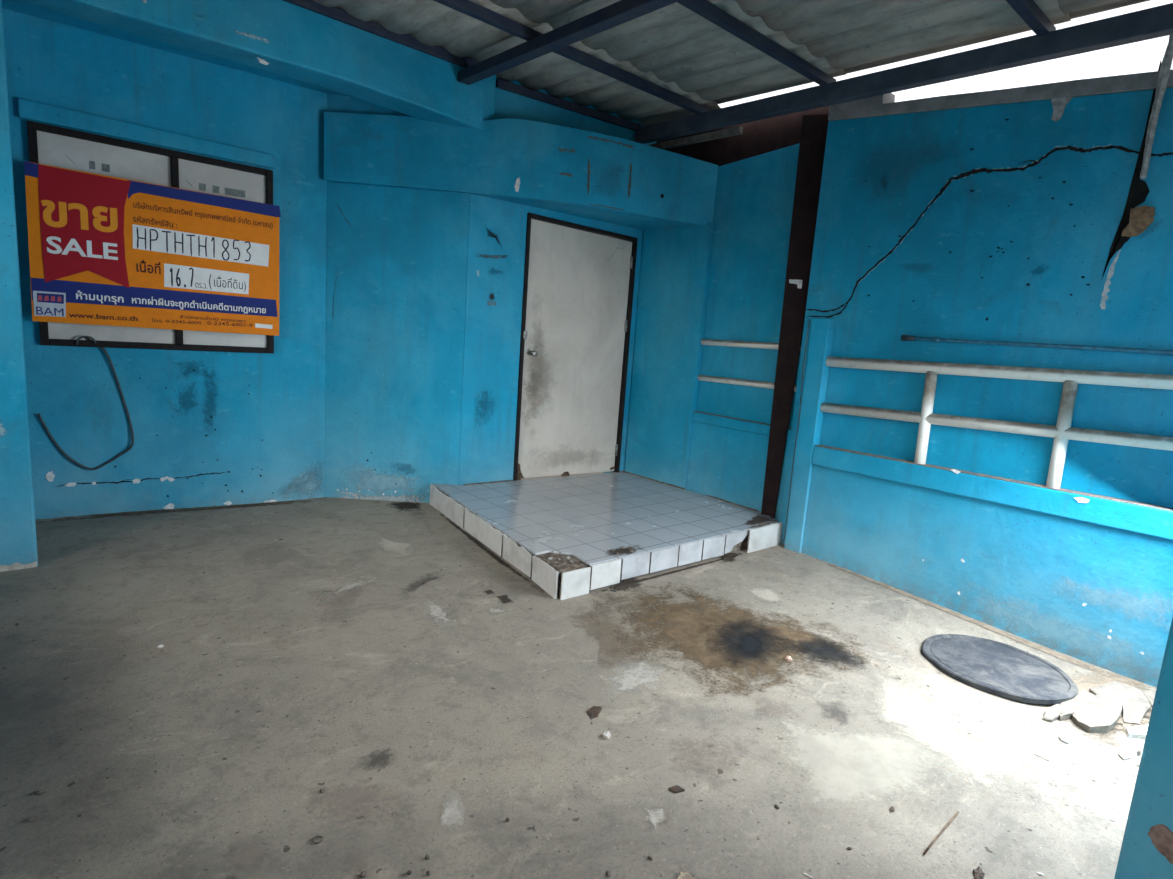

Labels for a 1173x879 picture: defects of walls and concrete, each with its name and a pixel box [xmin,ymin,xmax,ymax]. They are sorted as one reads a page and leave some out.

spalling [1100,32,1173,309]
crack [805,144,1173,318]
crack [56,472,226,487]
spalling [547,556,587,575]
spalling [1043,681,1156,733]
spalling [1147,824,1173,864]